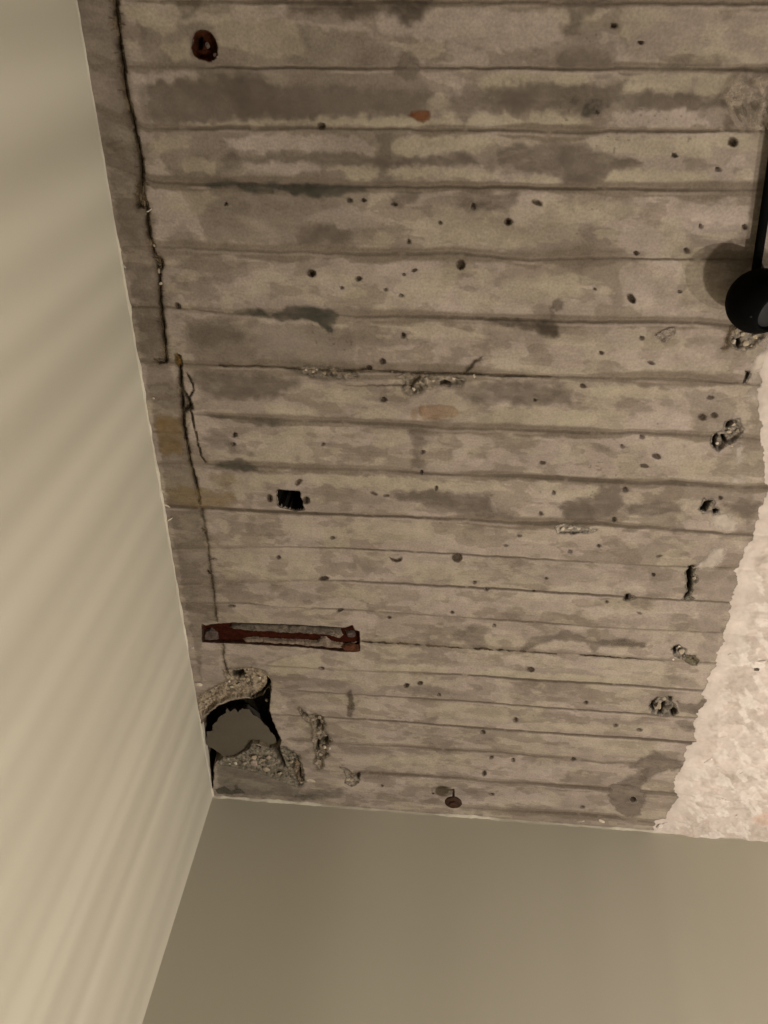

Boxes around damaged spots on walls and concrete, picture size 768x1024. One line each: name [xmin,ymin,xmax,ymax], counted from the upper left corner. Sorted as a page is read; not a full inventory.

crack [112,0,232,677]
damp [249,307,337,332]
spalling [396,372,476,396]
spalling [555,524,597,535]
flaking render [649,326,768,842]
rust [201,623,360,652]
spalling [195,667,333,788]
damp [608,754,682,817]